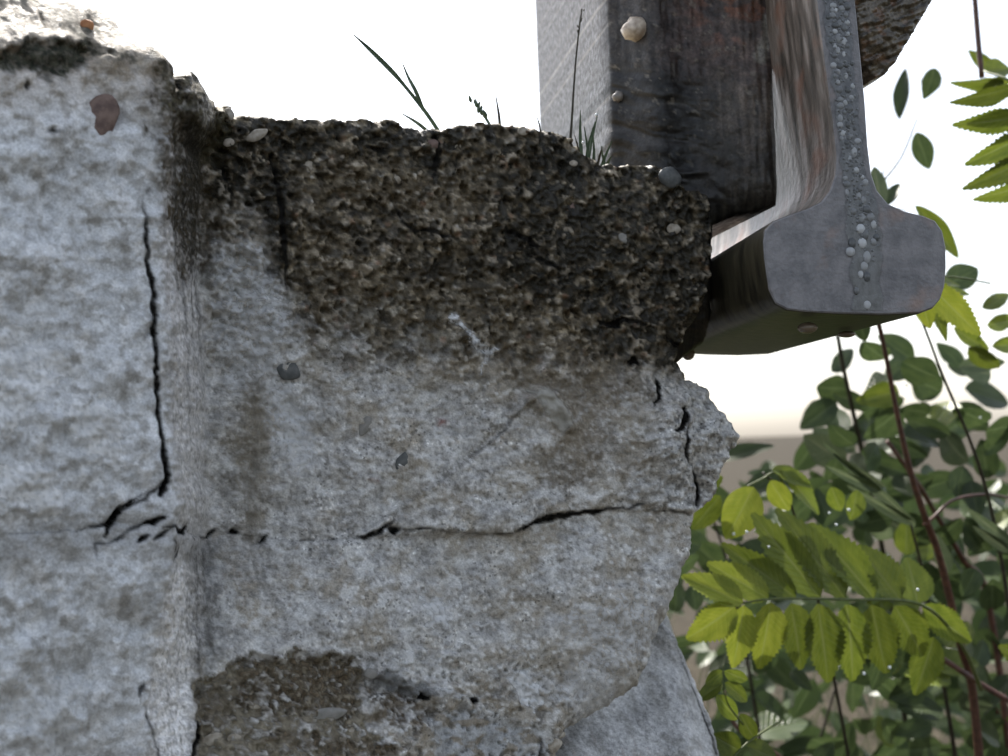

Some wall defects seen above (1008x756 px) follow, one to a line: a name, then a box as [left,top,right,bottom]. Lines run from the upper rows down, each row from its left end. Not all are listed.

damp [150,65,711,521]
crack [88,207,267,559]
crack [357,523,429,539]
crack [518,503,644,531]
crack [139,684,159,756]
crack [192,721,200,756]
spalling [191,646,439,756]
crack [692,688,717,754]